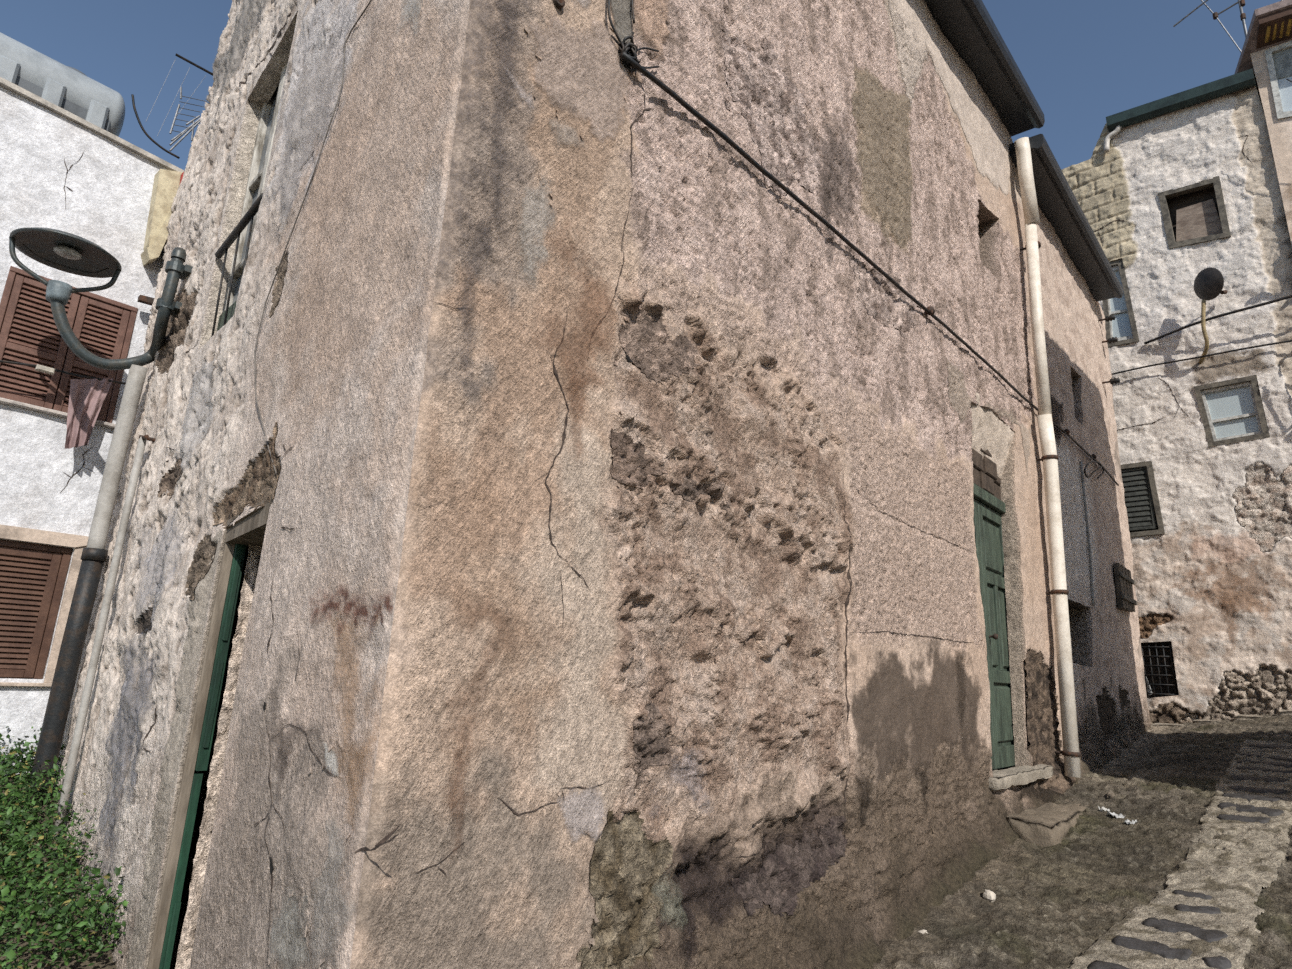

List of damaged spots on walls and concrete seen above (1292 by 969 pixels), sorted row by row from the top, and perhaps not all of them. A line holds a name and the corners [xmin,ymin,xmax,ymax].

crack [239,5,295,86]
crack [64,154,83,208]
flaking render [155,289,198,374]
crack [533,61,655,630]
crack [61,443,96,492]
flaking render [183,422,281,600]
flaking render [609,409,731,512]
flaking render [1232,462,1292,553]
water stain [852,641,983,823]
flaking render [1024,647,1076,794]
flaking render [1149,664,1292,724]
crack [255,717,343,969]